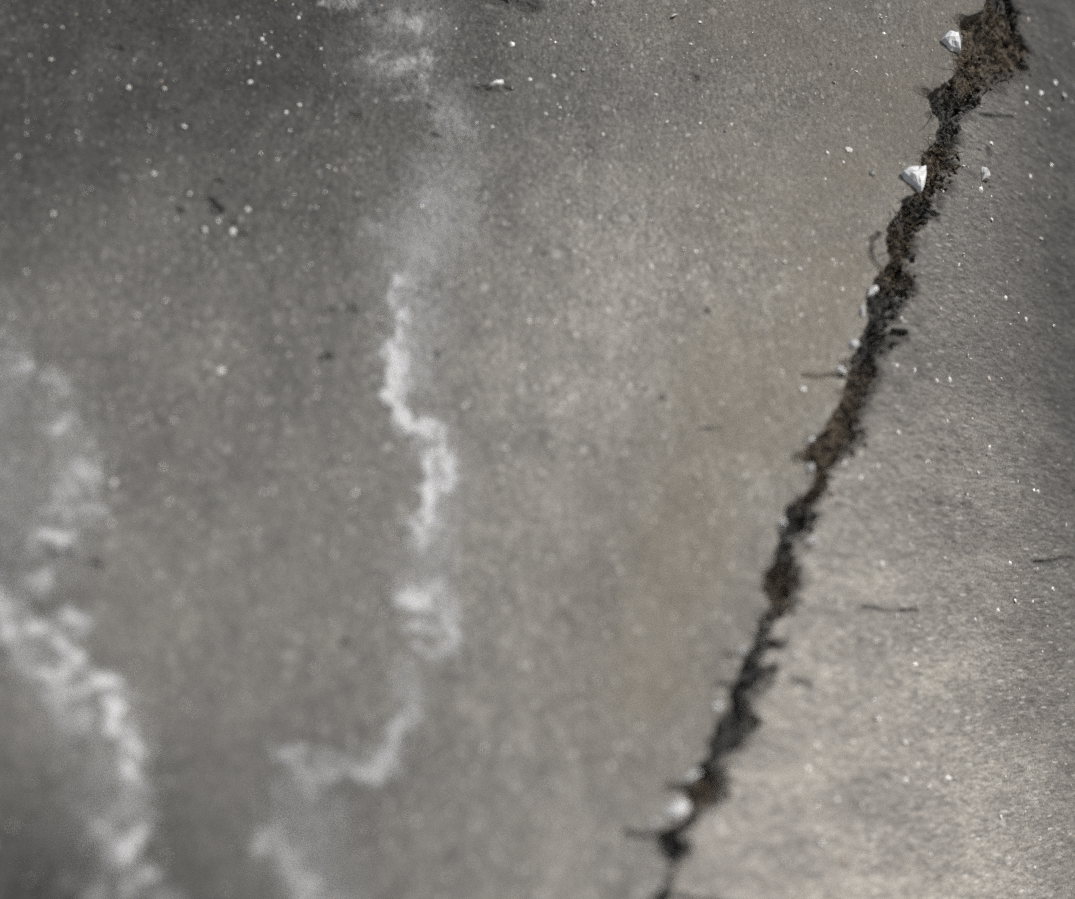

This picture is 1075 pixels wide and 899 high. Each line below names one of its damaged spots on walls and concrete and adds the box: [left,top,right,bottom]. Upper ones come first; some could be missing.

leakage [36,458,99,548]
leakage [378,273,458,553]
crack [623,0,1032,899]
leakage [0,598,145,810]
leakage [396,581,459,655]
leakage [101,824,148,867]